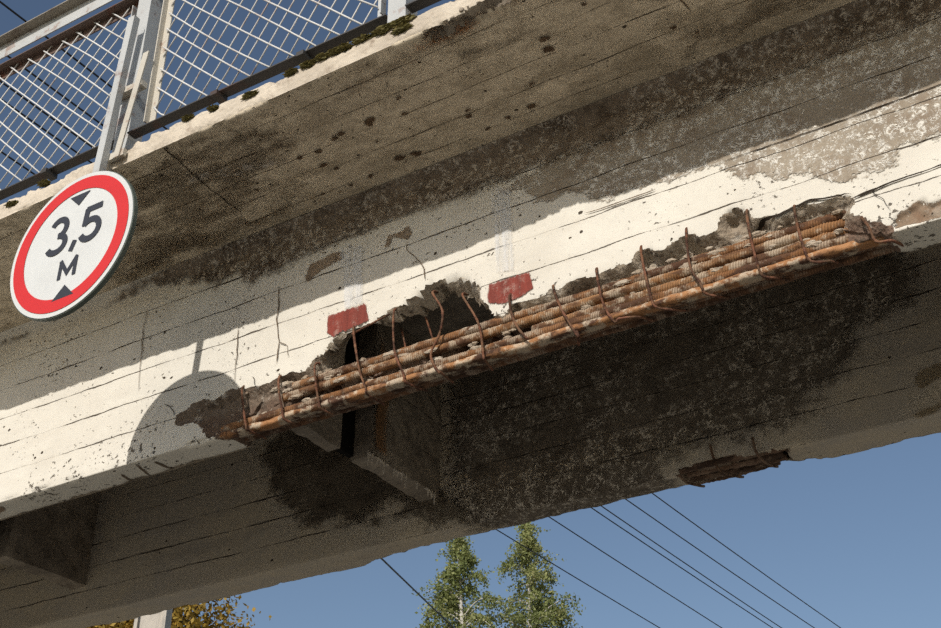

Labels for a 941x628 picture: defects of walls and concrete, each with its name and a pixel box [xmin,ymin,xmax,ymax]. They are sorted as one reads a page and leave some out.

spalling [422,0,512,50]
leakage [117,0,941,301]
peeling [175,13,941,531]